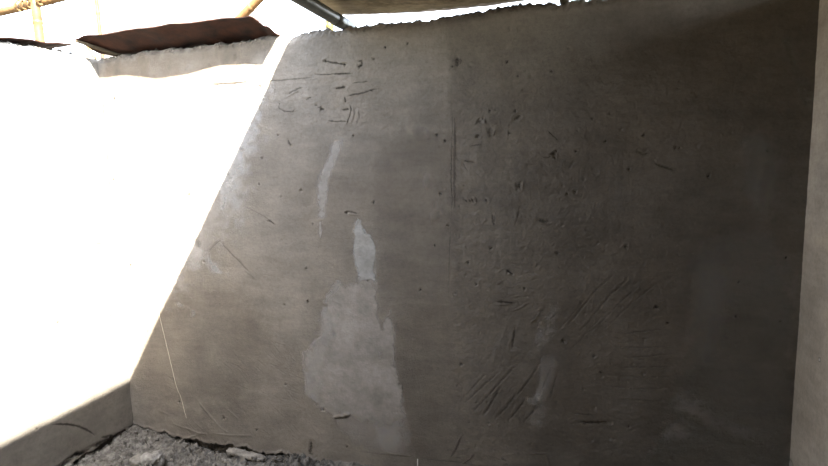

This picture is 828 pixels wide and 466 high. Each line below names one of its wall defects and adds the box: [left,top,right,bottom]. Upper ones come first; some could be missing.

water stain [303,219,405,427]